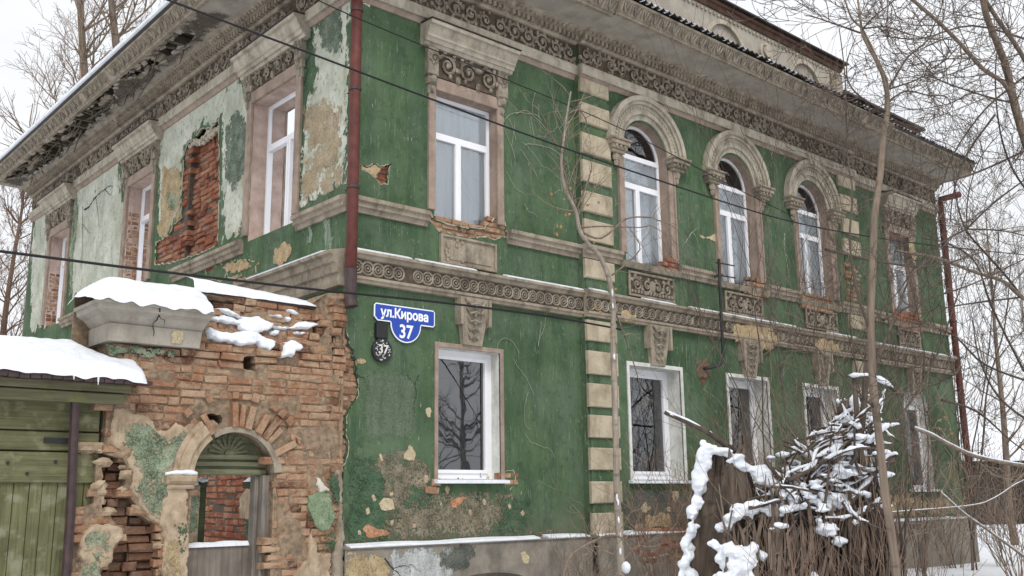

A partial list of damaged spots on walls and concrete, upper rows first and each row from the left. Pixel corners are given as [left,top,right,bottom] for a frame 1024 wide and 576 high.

spalling [0,31,195,179]
peeling [299,1,390,208]
flaking render [154,79,252,266]
flaking render [205,259,259,284]
flaking render [273,241,292,266]
spalling [78,446,132,516]
peeling [349,445,561,543]